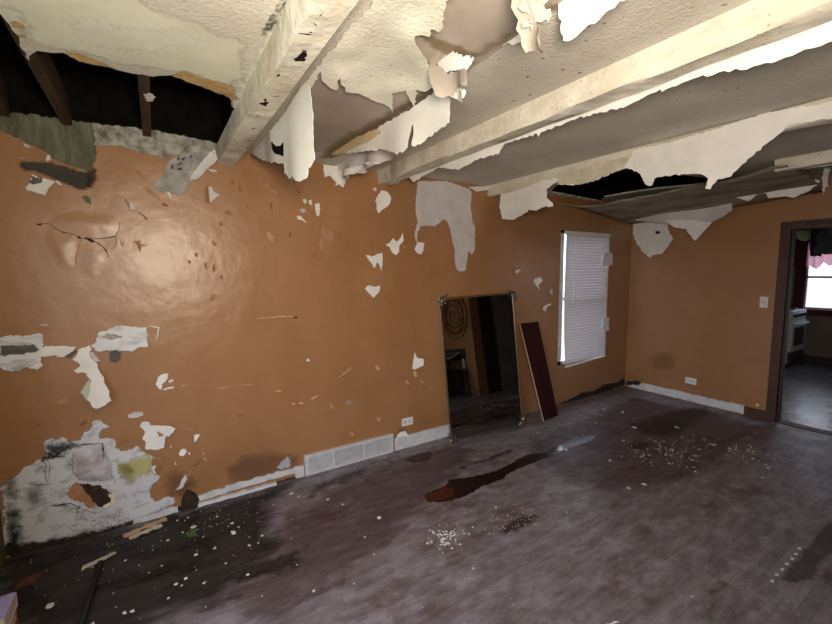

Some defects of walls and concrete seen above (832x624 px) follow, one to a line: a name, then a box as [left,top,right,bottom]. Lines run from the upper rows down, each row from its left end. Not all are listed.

peeling [0,0,247,85]
flaking render [0,112,219,206]
peeling [252,0,625,214]
peeling [366,20,832,272]
crack [36,222,124,265]
peeling [297,199,320,223]
peeling [0,324,159,409]
damp [0,420,305,624]